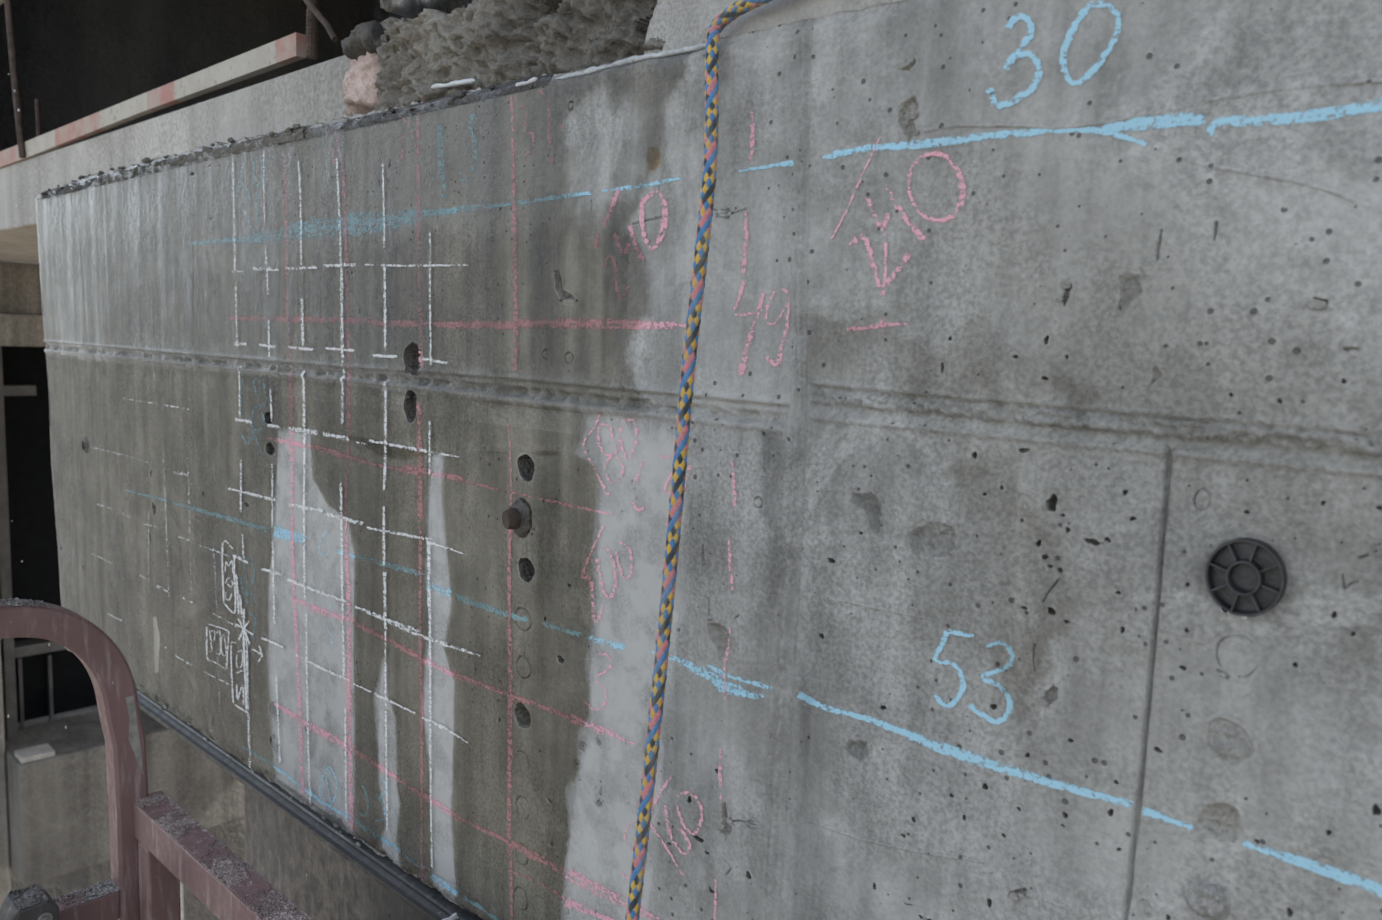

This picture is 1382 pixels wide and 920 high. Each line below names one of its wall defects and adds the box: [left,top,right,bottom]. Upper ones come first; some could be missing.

spalling [38,0,666,200]
leakage [35,133,338,490]
crack [1150,223,1169,265]
crack [1206,216,1223,246]
leakage [264,437,355,829]
leakage [424,653,454,822]
leakage [584,562,675,769]
leakage [435,847,455,886]
leakage [568,800,654,920]